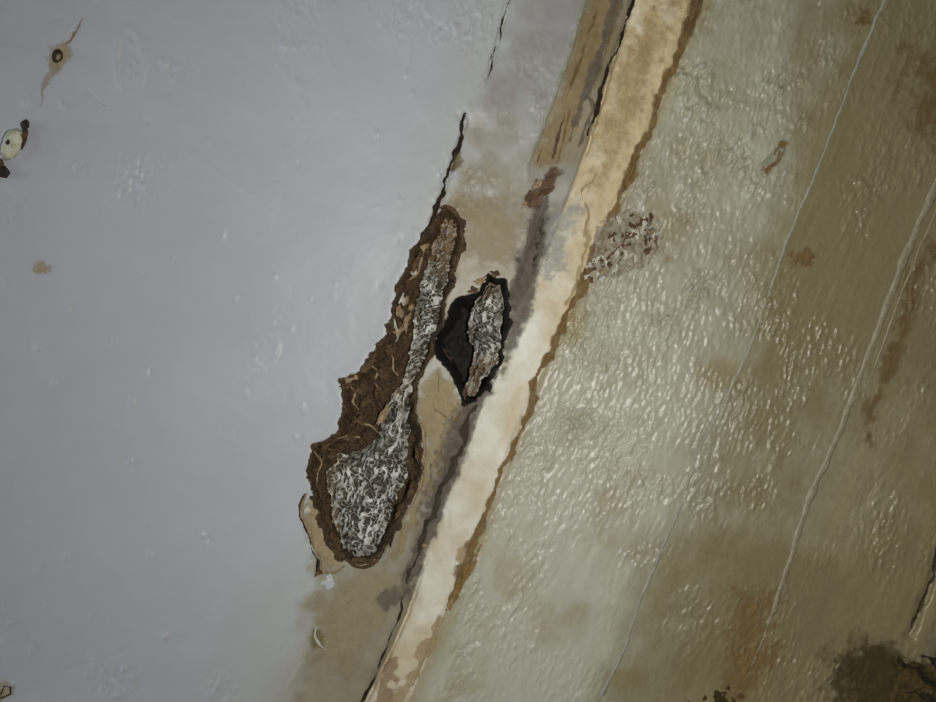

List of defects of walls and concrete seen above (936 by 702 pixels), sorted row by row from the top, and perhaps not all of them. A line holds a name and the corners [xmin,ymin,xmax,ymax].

rust [41,18,83,105]
crack [484,0,510,79]
damp [552,0,622,164]
crack [578,0,635,147]
damp [607,0,703,218]
crack [418,113,466,242]
rust [521,167,563,237]
peeling [583,207,664,283]
spalling [298,205,513,590]
damp [376,198,606,702]
damp [703,593,777,702]
damp [832,639,909,702]